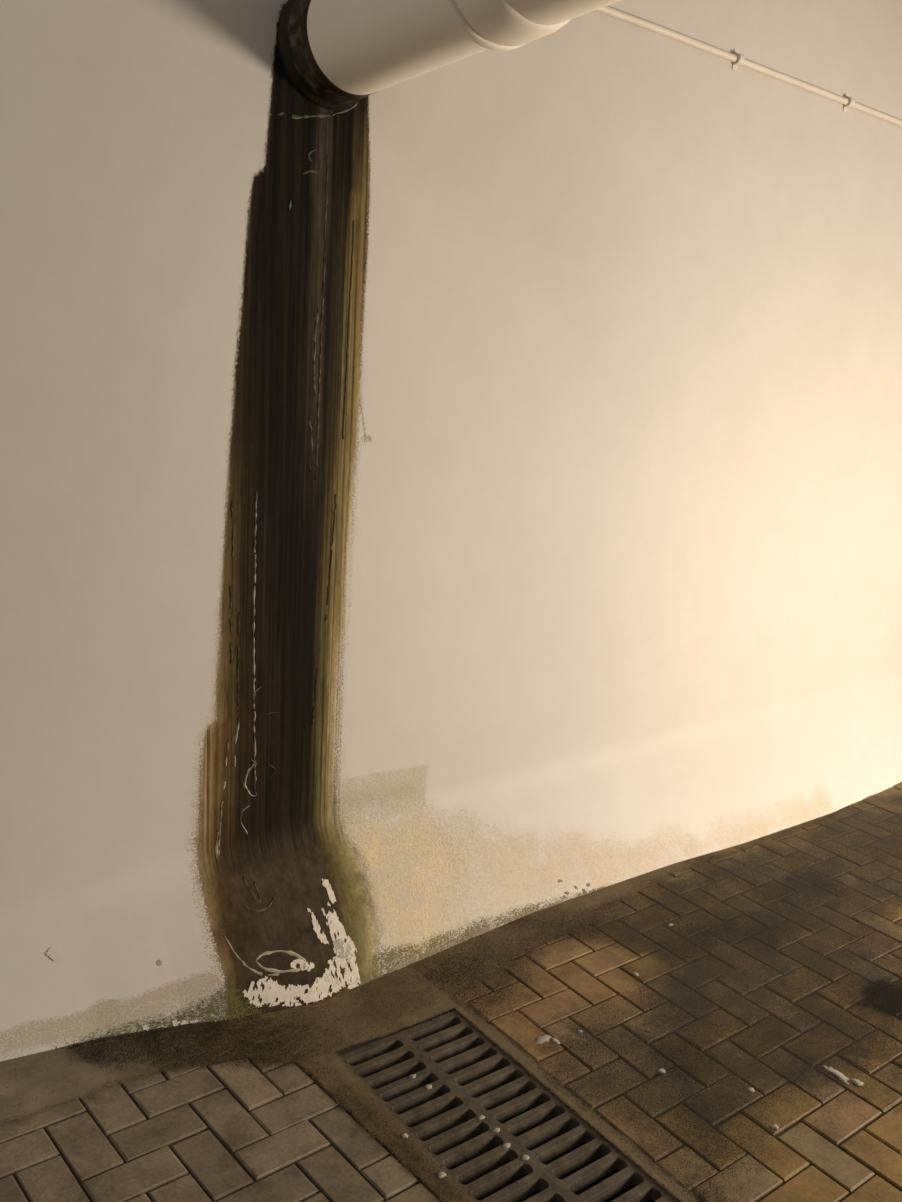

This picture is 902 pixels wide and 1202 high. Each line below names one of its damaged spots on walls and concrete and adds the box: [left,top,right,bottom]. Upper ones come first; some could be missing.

leakage [307,981,367,1057]